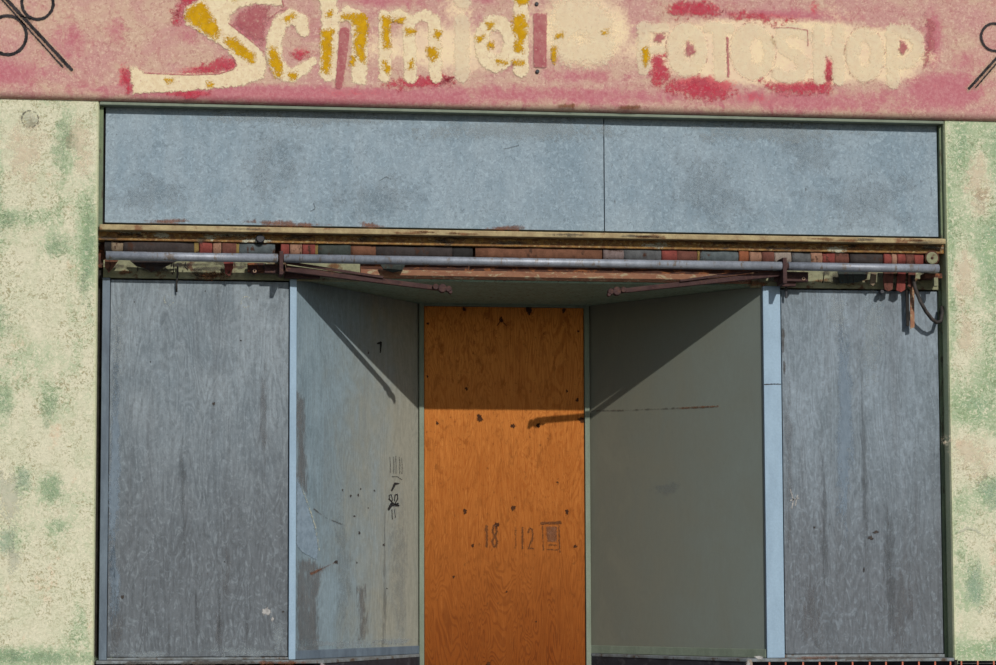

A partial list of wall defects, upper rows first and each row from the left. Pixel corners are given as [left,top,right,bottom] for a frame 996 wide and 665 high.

peeling [234,5,270,44]
peeling [669,0,793,27]
peeling [922,19,936,70]
peeling [122,66,133,94]
peeling [185,55,233,74]
peeling [382,74,455,91]
peeling [649,51,737,102]
peeling [758,56,833,97]
rust [199,220,311,243]
rust [396,231,474,245]
rust [812,238,873,252]
rust [143,262,246,280]